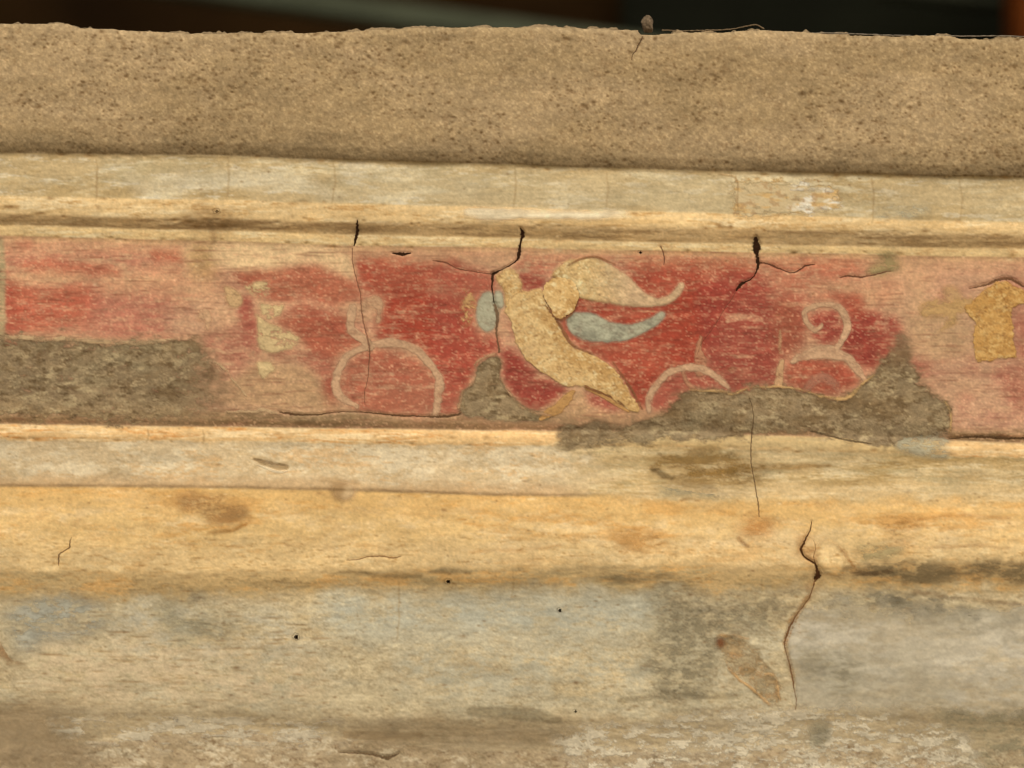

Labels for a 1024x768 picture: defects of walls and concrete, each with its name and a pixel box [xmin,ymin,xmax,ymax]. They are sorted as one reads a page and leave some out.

crack [280,220,461,418]
crack [393,228,525,353]
crack [736,237,815,291]
flaking render [0,331,247,428]
flaking render [458,354,552,422]
flaking render [557,344,952,450]
crack [784,521,822,710]